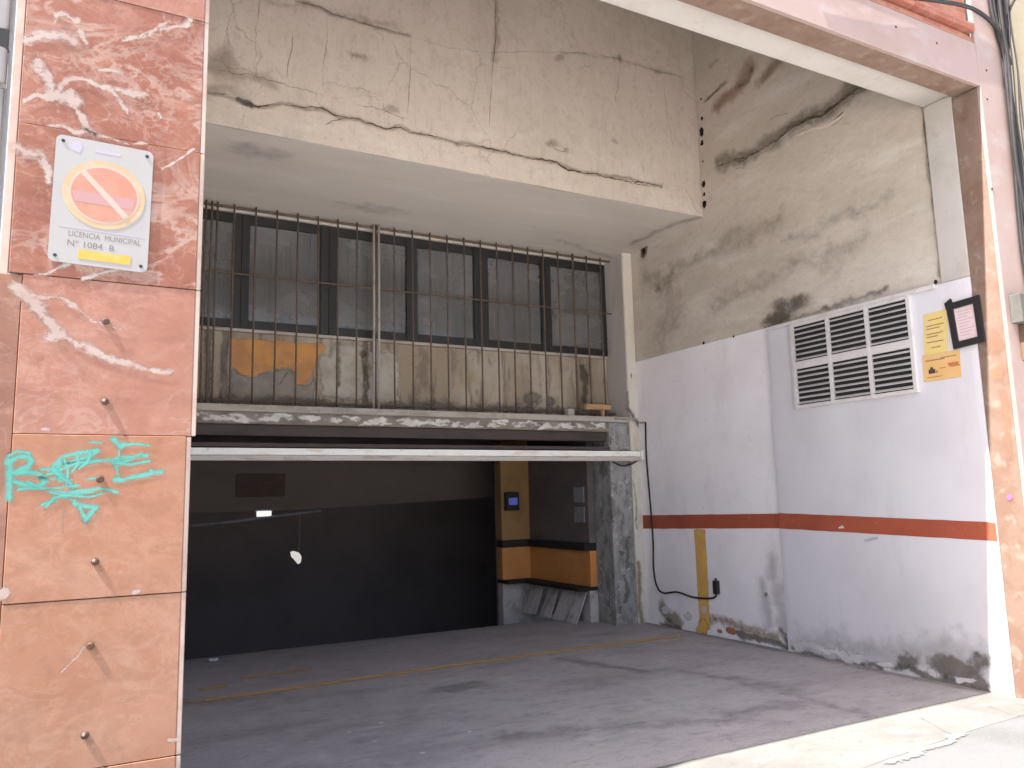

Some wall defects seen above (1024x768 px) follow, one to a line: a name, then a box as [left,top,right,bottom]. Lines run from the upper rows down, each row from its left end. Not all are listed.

crack [218,93,663,188]
crack [715,80,866,169]
peeling [196,338,605,430]
peeling [793,639,894,668]